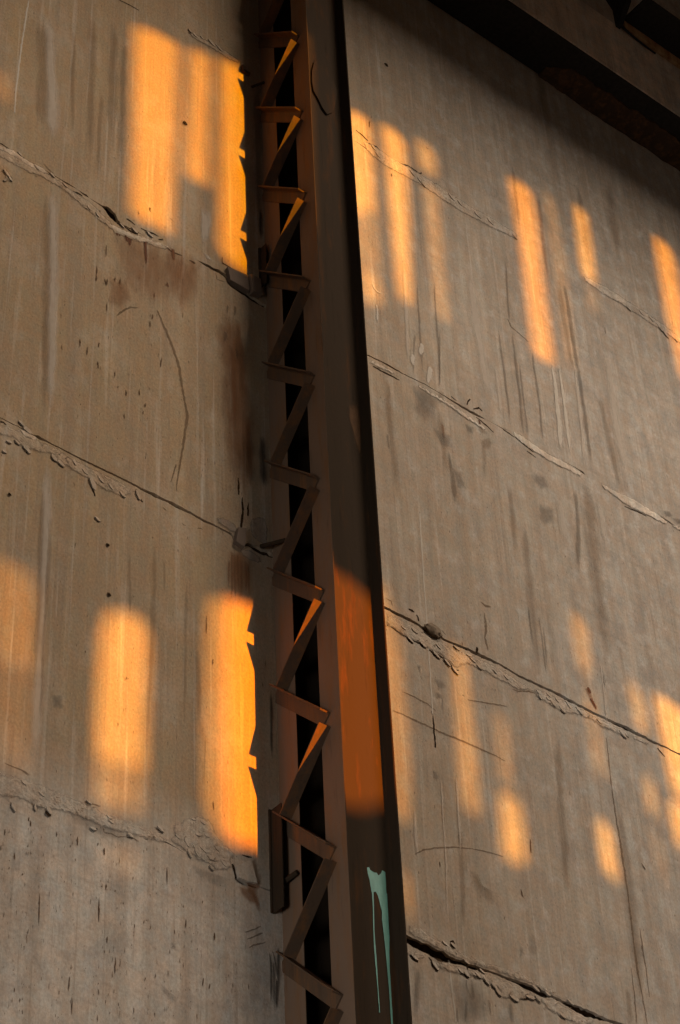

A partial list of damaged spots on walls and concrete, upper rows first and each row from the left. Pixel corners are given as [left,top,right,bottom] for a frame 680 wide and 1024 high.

crack [73,191,264,307]
crack [451,396,536,458]
crack [237,478,273,558]
crack [387,599,490,671]
crack [395,692,504,761]
crack [468,689,533,706]
crack [86,801,159,840]
spalling [171,817,237,871]
crack [232,854,256,888]
crack [506,721,665,1024]
crack [407,938,479,971]